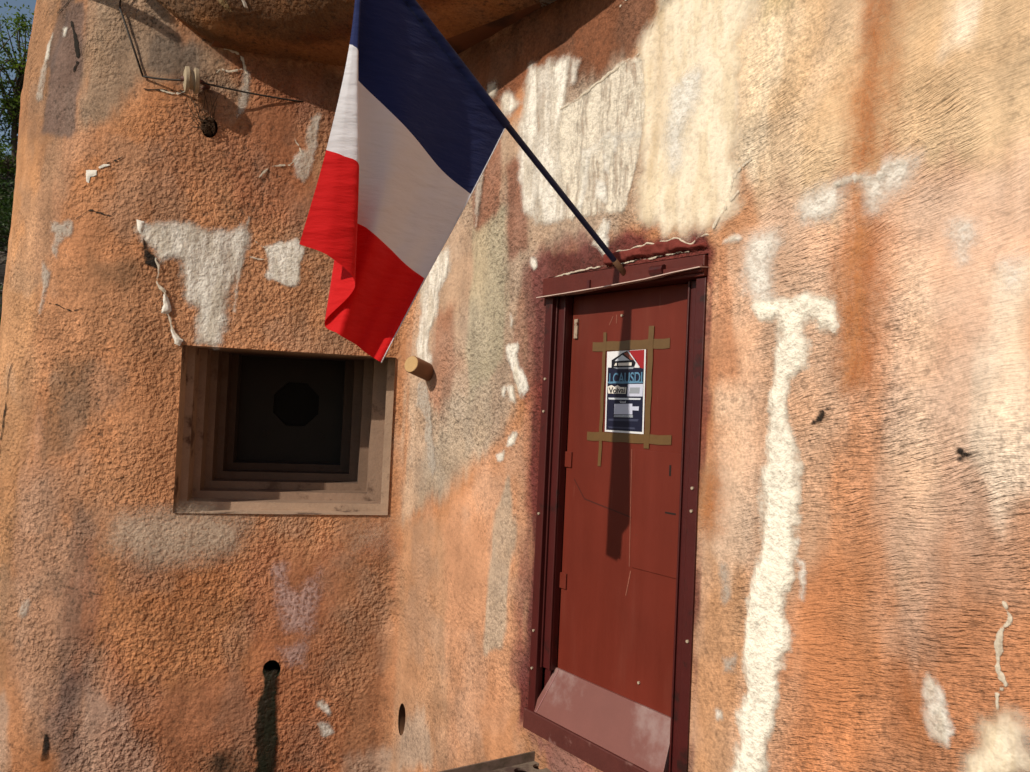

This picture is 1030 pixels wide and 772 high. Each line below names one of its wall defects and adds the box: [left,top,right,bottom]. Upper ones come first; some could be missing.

spalling [136,219,304,346]
water stain [724,233,840,772]
water stain [273,564,318,631]
water stain [254,670,278,772]
efflorescence [967,601,1030,772]